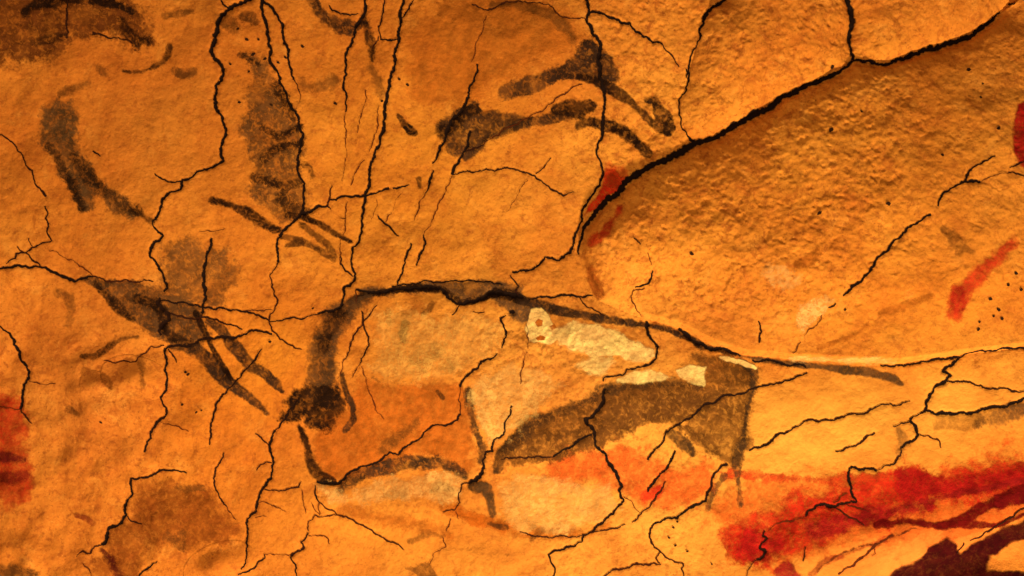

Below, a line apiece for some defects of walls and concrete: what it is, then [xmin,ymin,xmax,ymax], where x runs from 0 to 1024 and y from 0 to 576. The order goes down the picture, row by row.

crack [76,469,187,573]
crack [213,310,515,576]
crack [0,0,1000,453]
crack [429,155,1024,576]